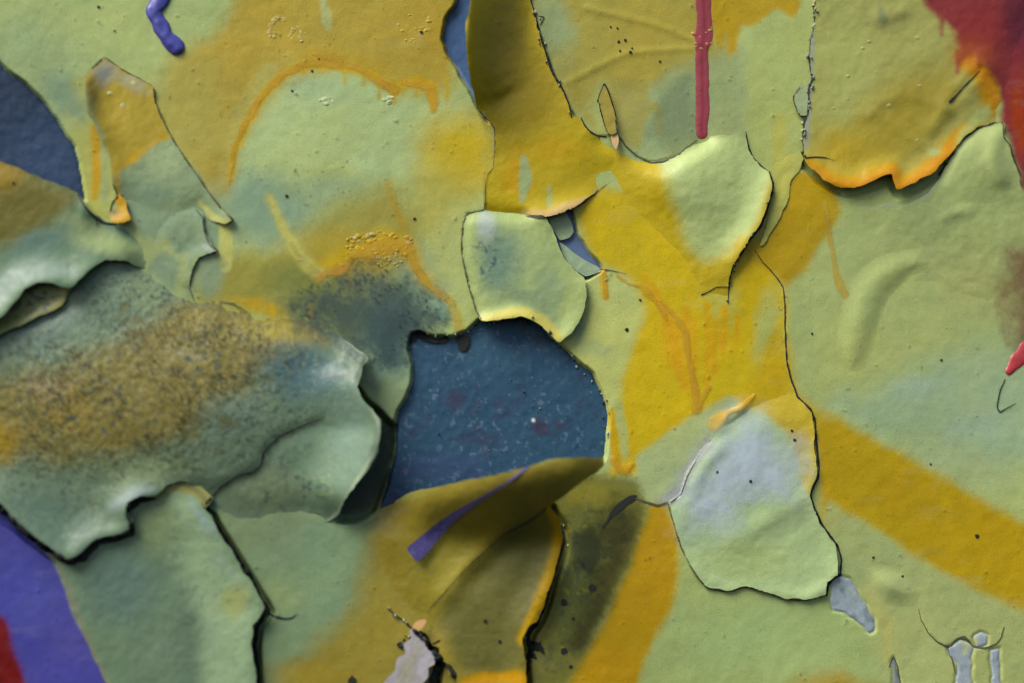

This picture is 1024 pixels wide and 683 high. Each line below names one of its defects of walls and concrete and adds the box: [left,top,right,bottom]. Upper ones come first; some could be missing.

crack [525,184,607,219]
crack [531,0,697,163]
crack [793,0,833,160]
peeling [0,58,381,683]
peeling [364,0,1024,683]
crack [602,131,842,601]
crack [204,417,324,683]